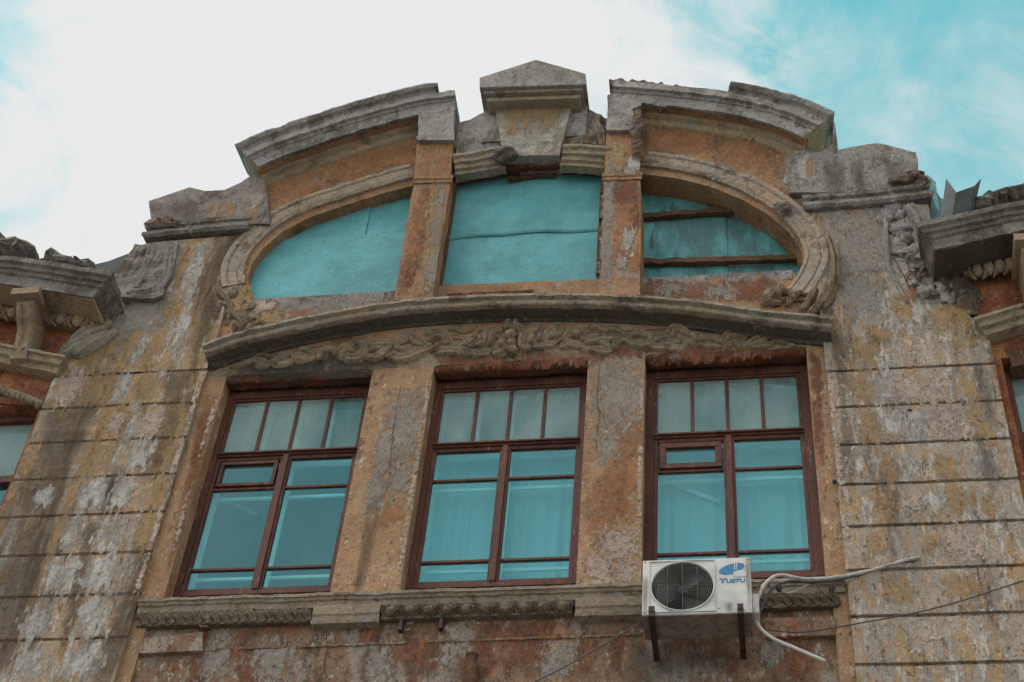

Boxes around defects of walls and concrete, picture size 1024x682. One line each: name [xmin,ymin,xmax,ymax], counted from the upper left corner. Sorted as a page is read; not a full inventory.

peeling [598,202,767,302]
peeling [2,241,300,682]
peeling [809,353,881,549]
peeling [839,265,1000,563]